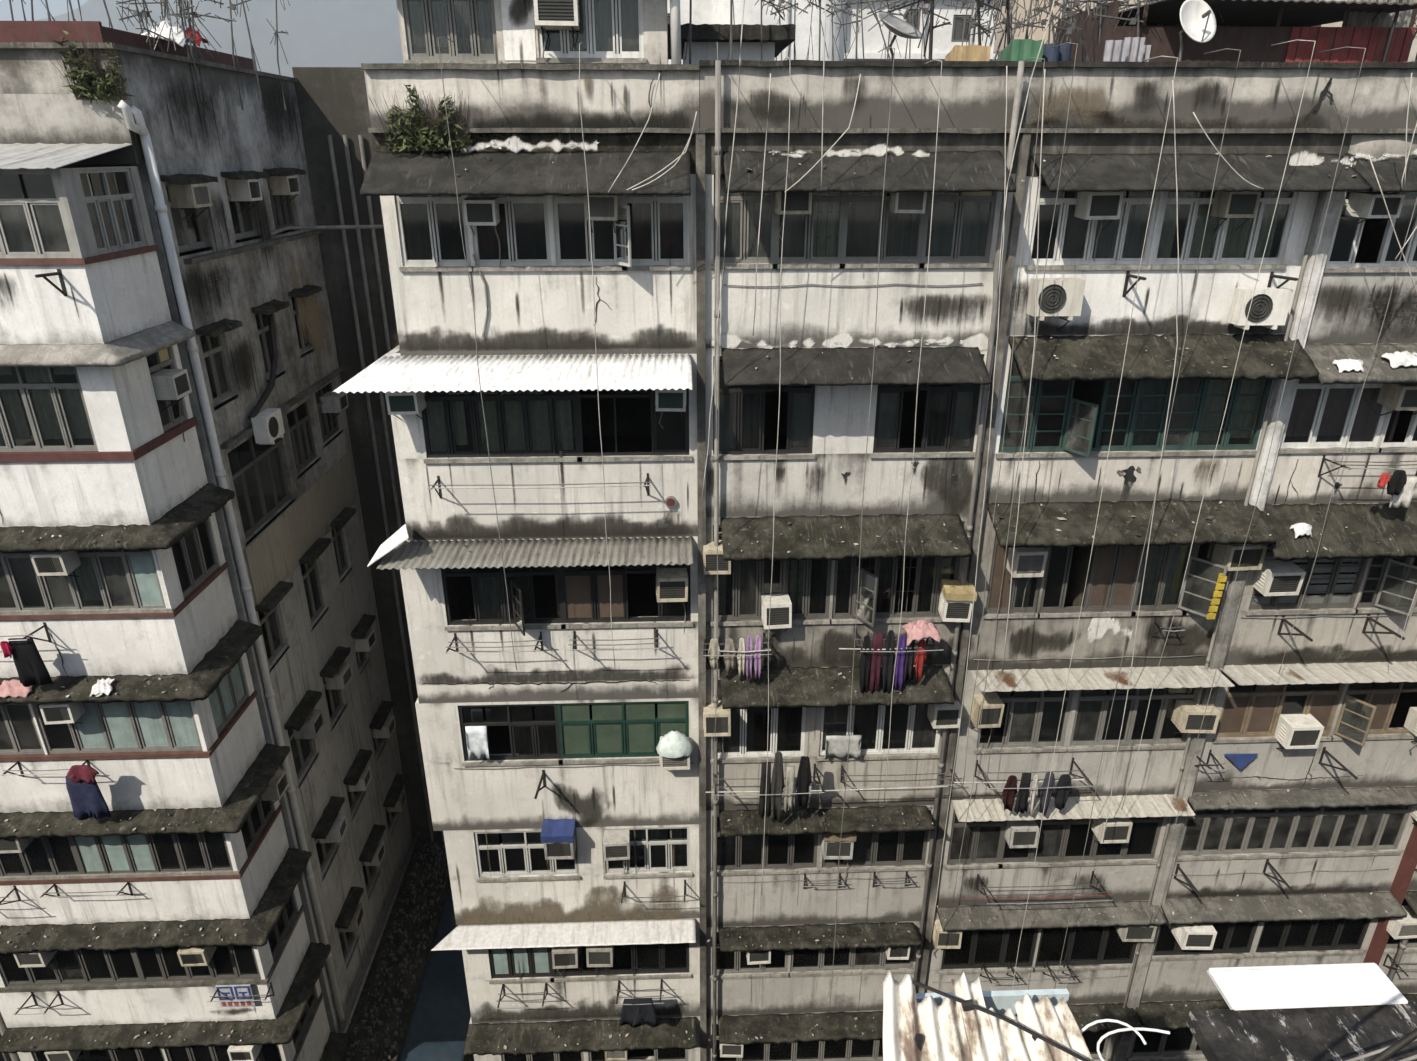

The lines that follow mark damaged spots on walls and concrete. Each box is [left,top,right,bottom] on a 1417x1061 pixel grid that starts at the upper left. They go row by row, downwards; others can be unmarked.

damp [509,0,532,25]
damp [166,81,299,150]
damp [474,74,688,135]
damp [1021,76,1324,129]
damp [396,295,692,350]
crack [595,277,612,323]
damp [1316,286,1417,336]
damp [1010,627,1073,657]
peeling [1087,612,1133,642]
damp [1125,620,1213,656]
damp [543,784,615,869]
damp [459,849,682,925]